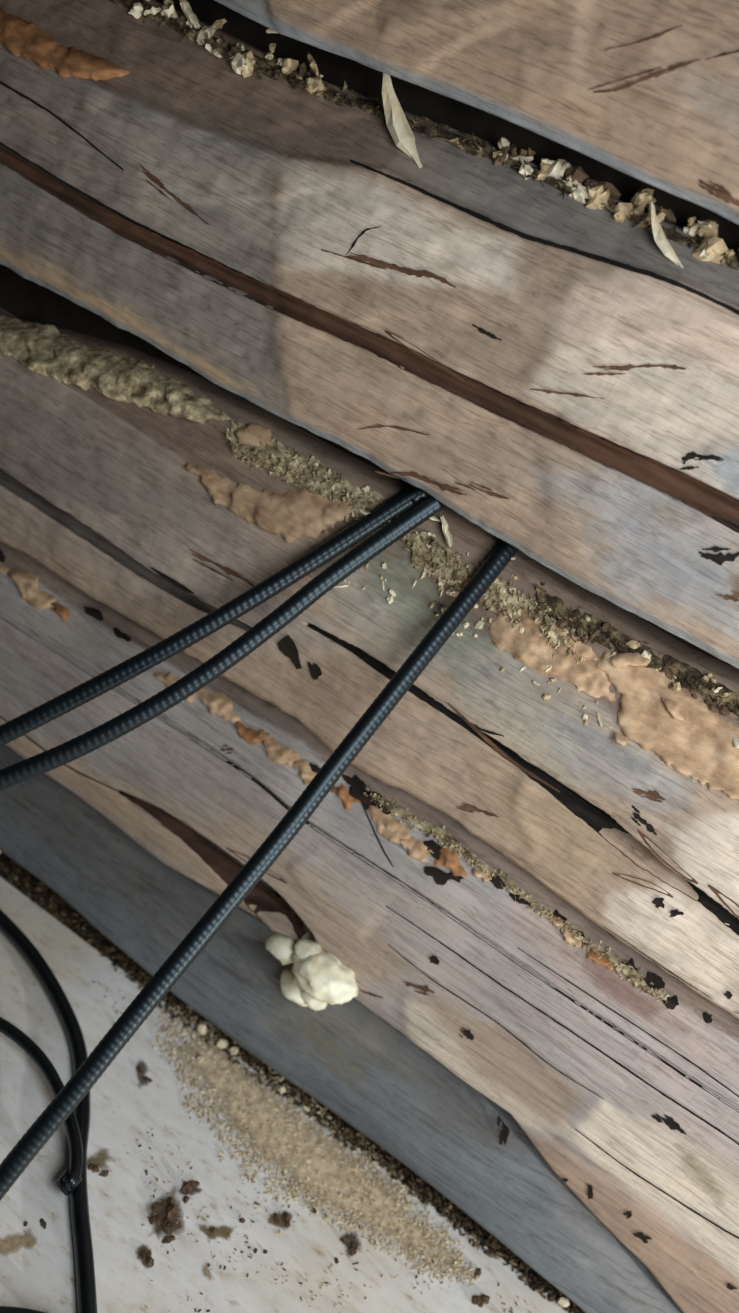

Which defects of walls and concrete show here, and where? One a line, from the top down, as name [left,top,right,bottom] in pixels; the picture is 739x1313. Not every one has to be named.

crack [0,81,124,170]
crack [0,147,739,533]
crack [0,470,251,631]
crack [0,617,739,1145]
crack [575,1129,739,1239]